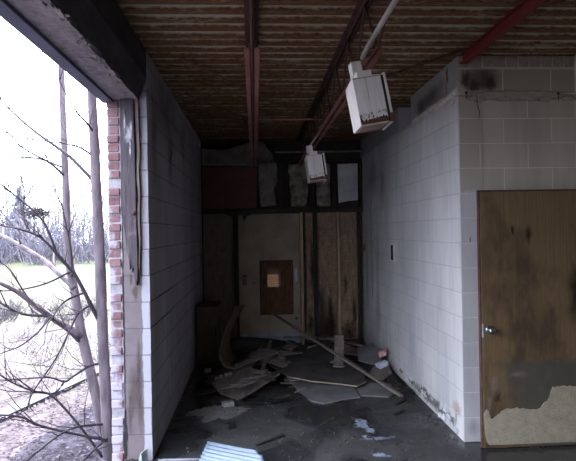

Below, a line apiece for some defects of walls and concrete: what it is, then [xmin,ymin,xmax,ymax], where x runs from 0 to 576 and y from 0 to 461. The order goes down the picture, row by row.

water stain [463,71,494,102]